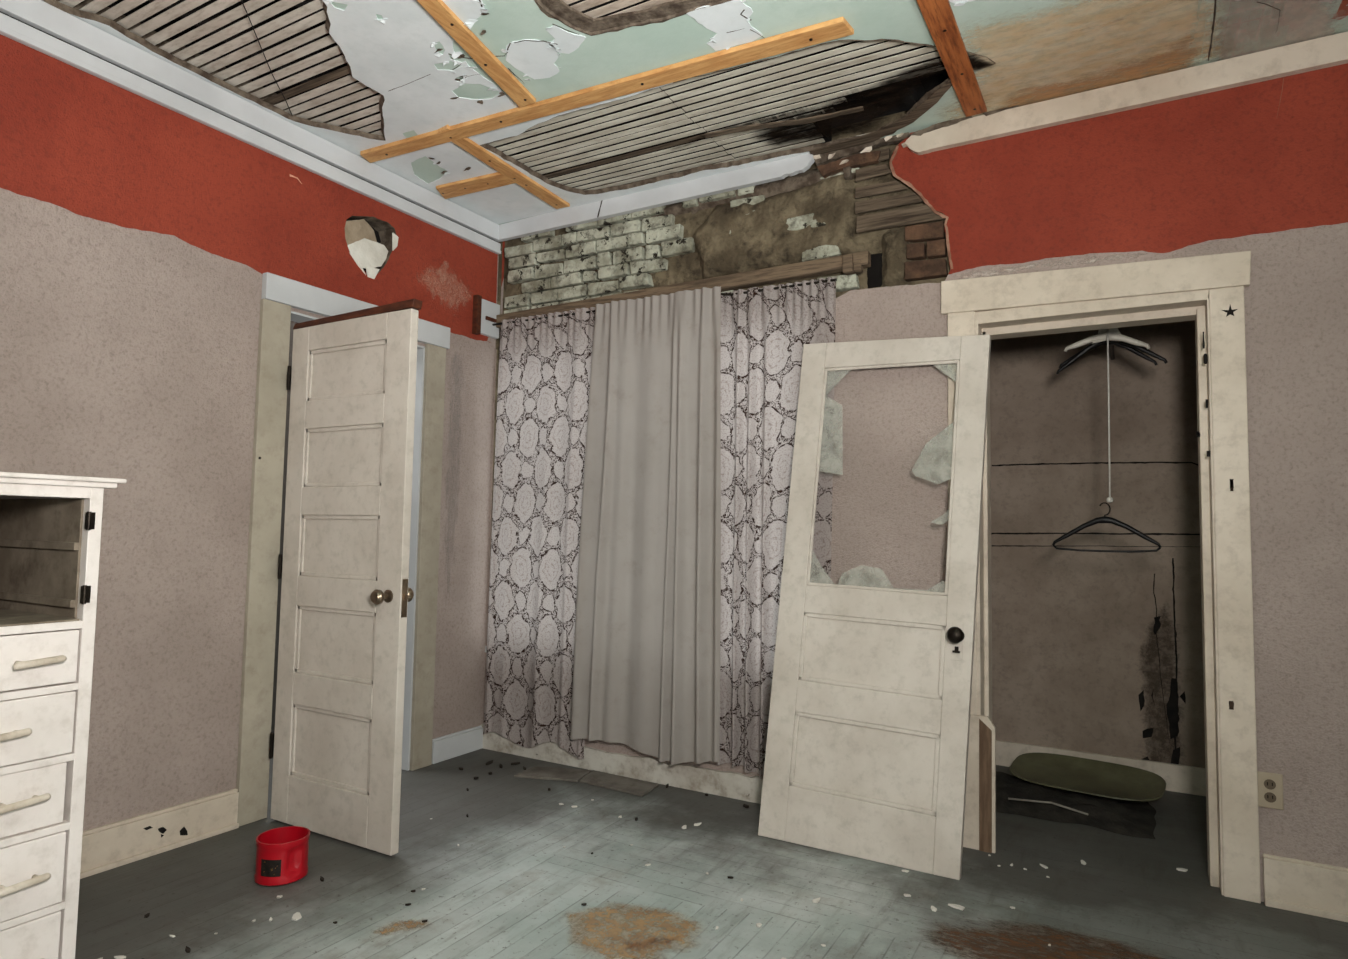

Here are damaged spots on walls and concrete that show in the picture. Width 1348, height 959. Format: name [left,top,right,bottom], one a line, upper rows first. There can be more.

leakage [957,0,1336,119]
crack [1208,0,1216,61]
peeling [1332,0,1348,20]
spalling [42,0,1019,314]
leakage [1141,609,1181,763]